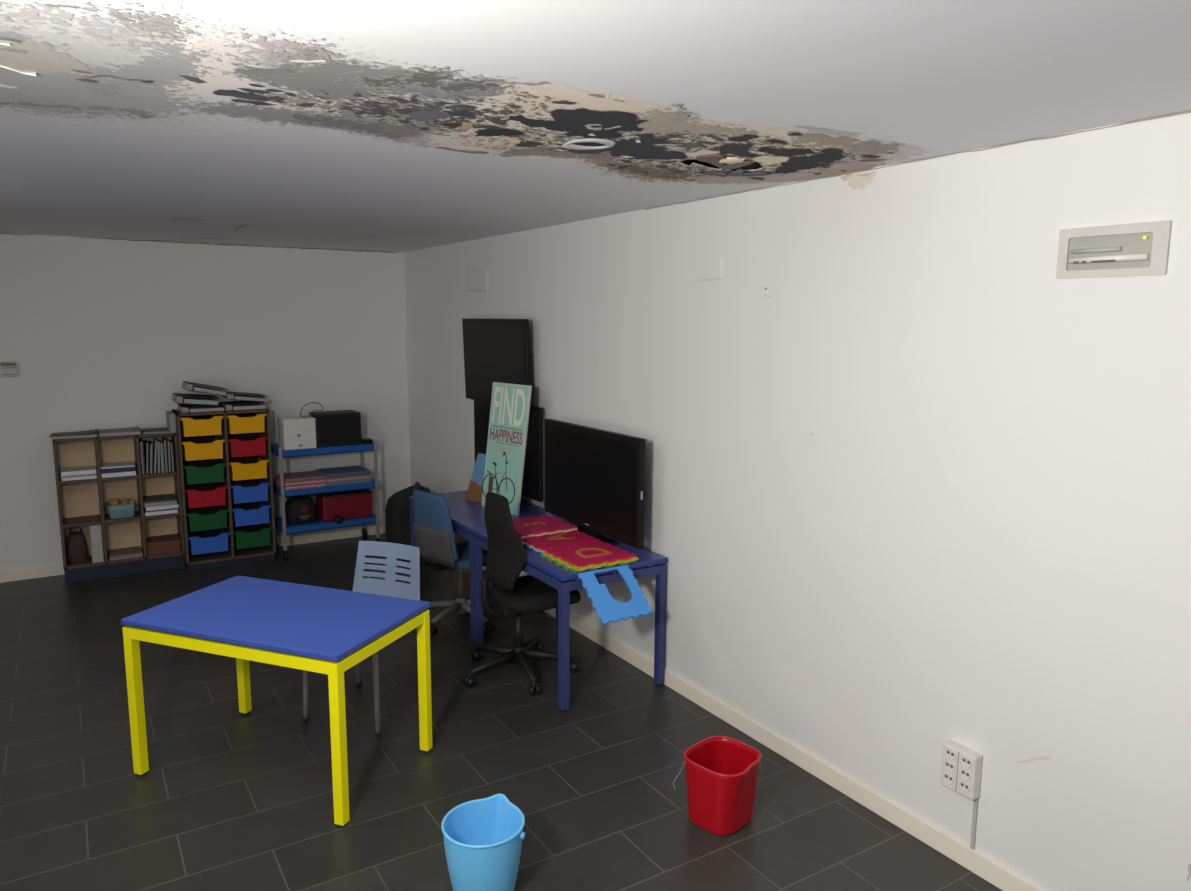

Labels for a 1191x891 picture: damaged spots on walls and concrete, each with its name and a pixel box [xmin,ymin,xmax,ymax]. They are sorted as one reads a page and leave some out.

peeling [0,40,100,76]
leakage [0,0,934,184]
peeling [249,81,885,184]